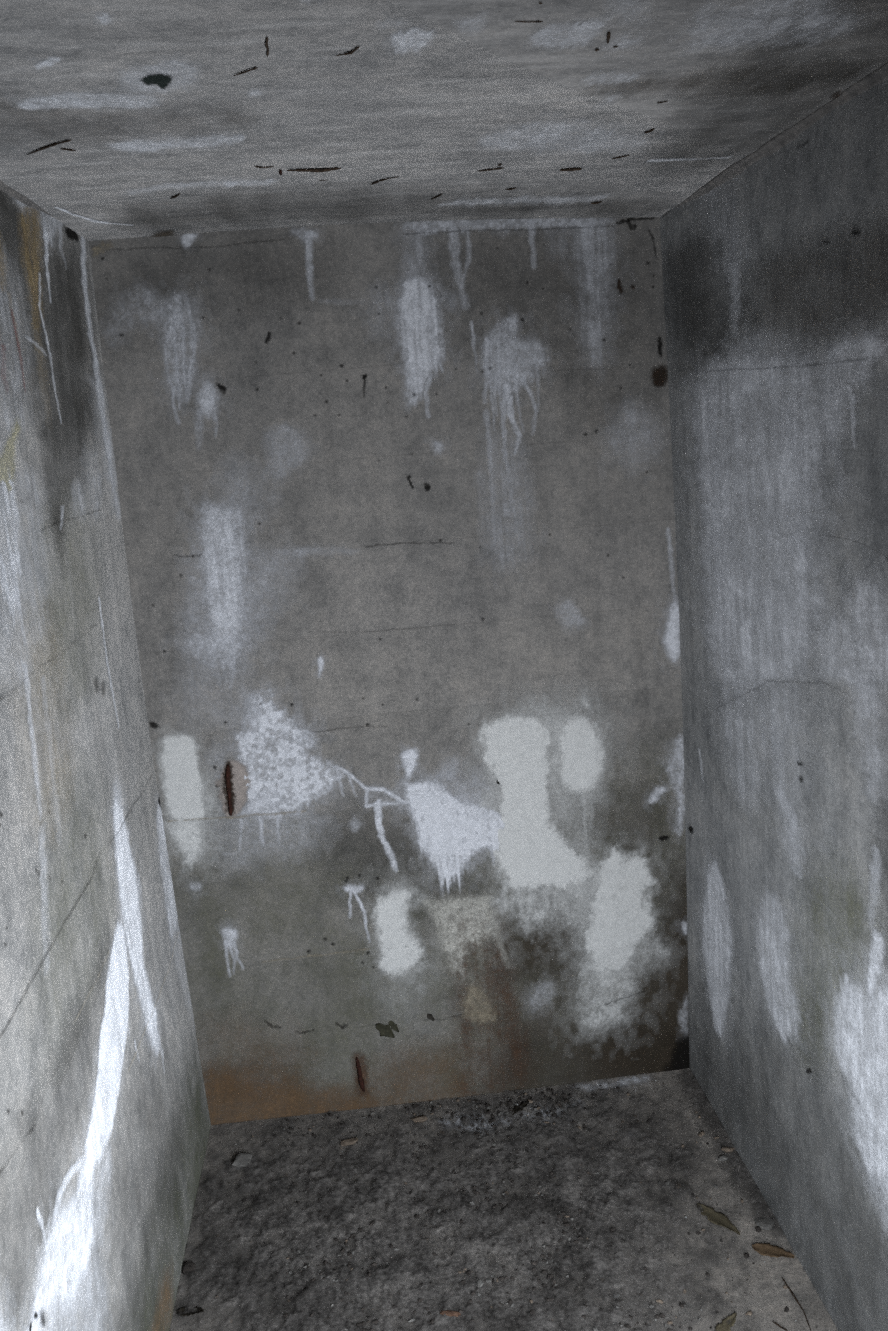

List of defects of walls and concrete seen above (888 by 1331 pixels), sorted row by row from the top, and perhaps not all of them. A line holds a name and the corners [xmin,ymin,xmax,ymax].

water stain [79,236,111,459]
water stain [165,296,217,419]
efflorescence [397,276,444,405]
efflorescence [405,218,607,297]
efflorescence [694,336,888,716]
efflorescence [157,734,214,936]
rust [224,765,233,816]
water stain [222,929,241,973]
water stain [236,689,732,1089]
efflorescence [28,795,160,1331]
rust [355,1055,367,1093]
efflorescence [835,931,888,1179]